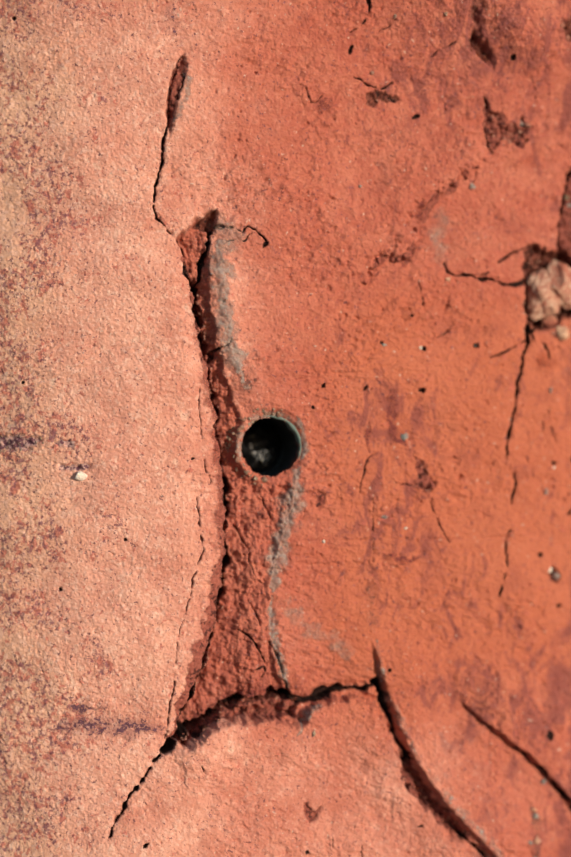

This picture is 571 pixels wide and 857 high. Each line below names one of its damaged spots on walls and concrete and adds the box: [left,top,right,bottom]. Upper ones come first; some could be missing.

crack [443,245,529,287]
crack [489,323,550,504]
crack [109,59,412,838]
crack [499,529,511,597]
crack [515,746,571,811]
crack [448,822,486,857]